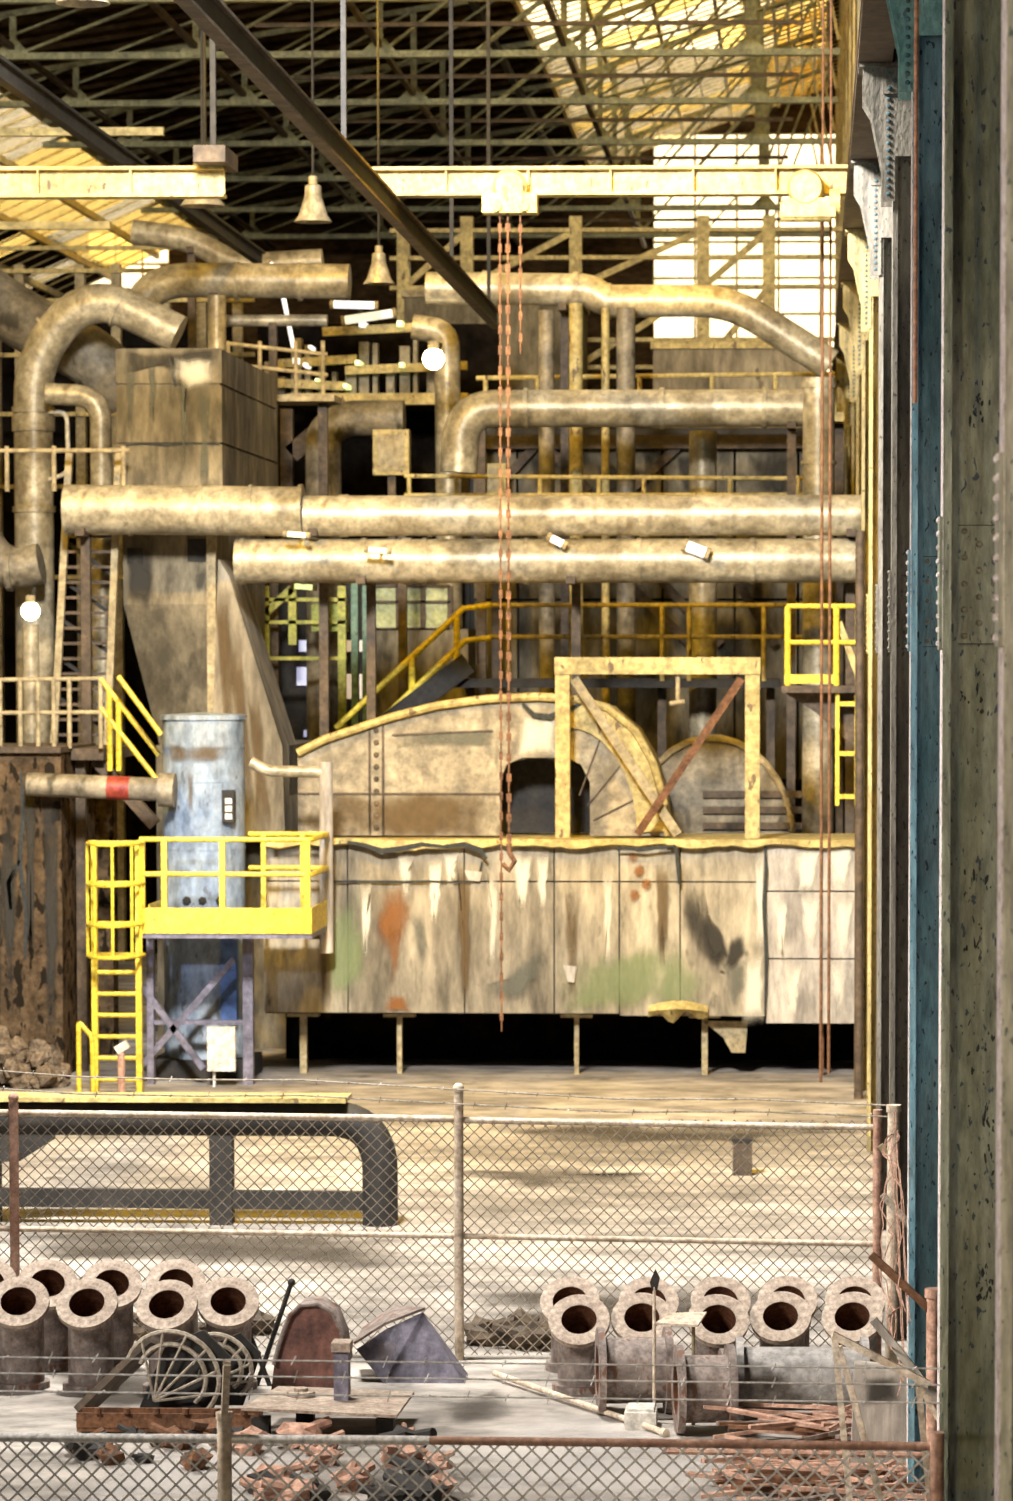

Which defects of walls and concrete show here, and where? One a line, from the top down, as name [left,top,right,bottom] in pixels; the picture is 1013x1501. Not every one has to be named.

damp [321,894,370,993]
corrosion [379,893,408,965]
damp [401,861,410,889]
damp [416,858,469,988]
damp [493,957,537,996]
damp [516,861,547,901]
damp [567,910,575,964]
damp [580,875,692,1004]
damp [686,900,762,1013]
damp [787,971,800,1011]
damp [756,849,852,954]
damp [834,974,843,998]